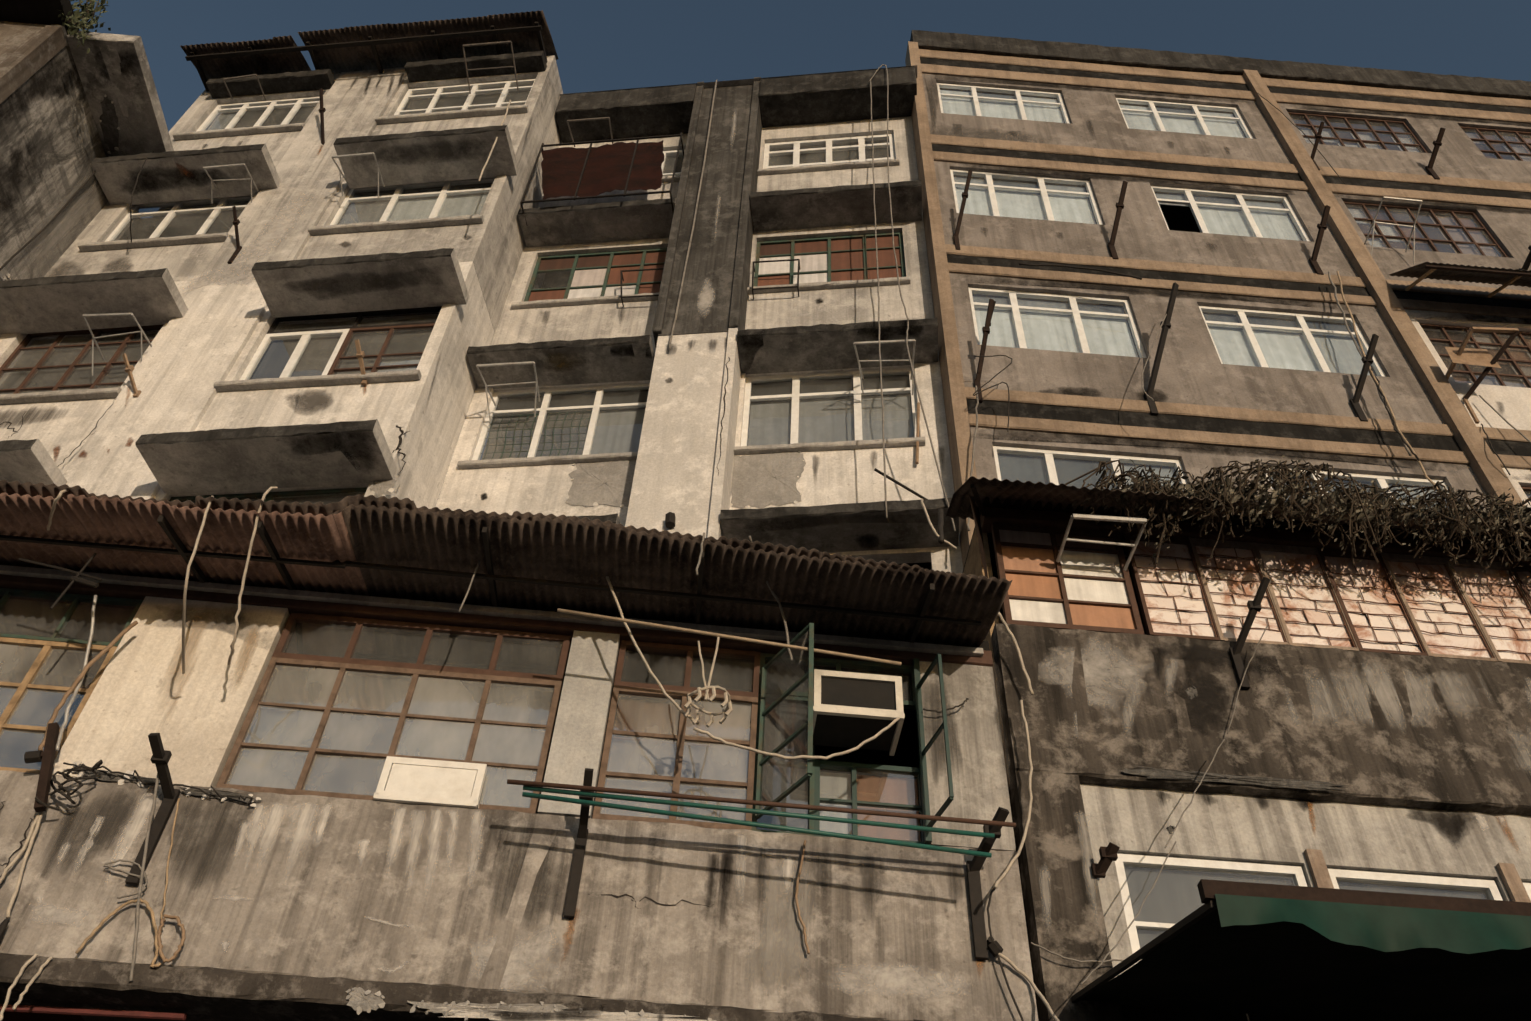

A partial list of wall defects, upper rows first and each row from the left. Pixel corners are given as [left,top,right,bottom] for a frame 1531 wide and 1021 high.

damp [0,45,81,119]
damp [0,409,53,427]
damp [1153,645,1280,733]
crack [0,801,33,885]
damp [54,787,162,873]
damp [174,804,284,882]
damp [390,808,456,880]
damp [494,841,562,918]
crack [588,894,714,909]
damp [708,838,831,976]
damp [1413,810,1503,842]
spalling [407,1000,716,1021]